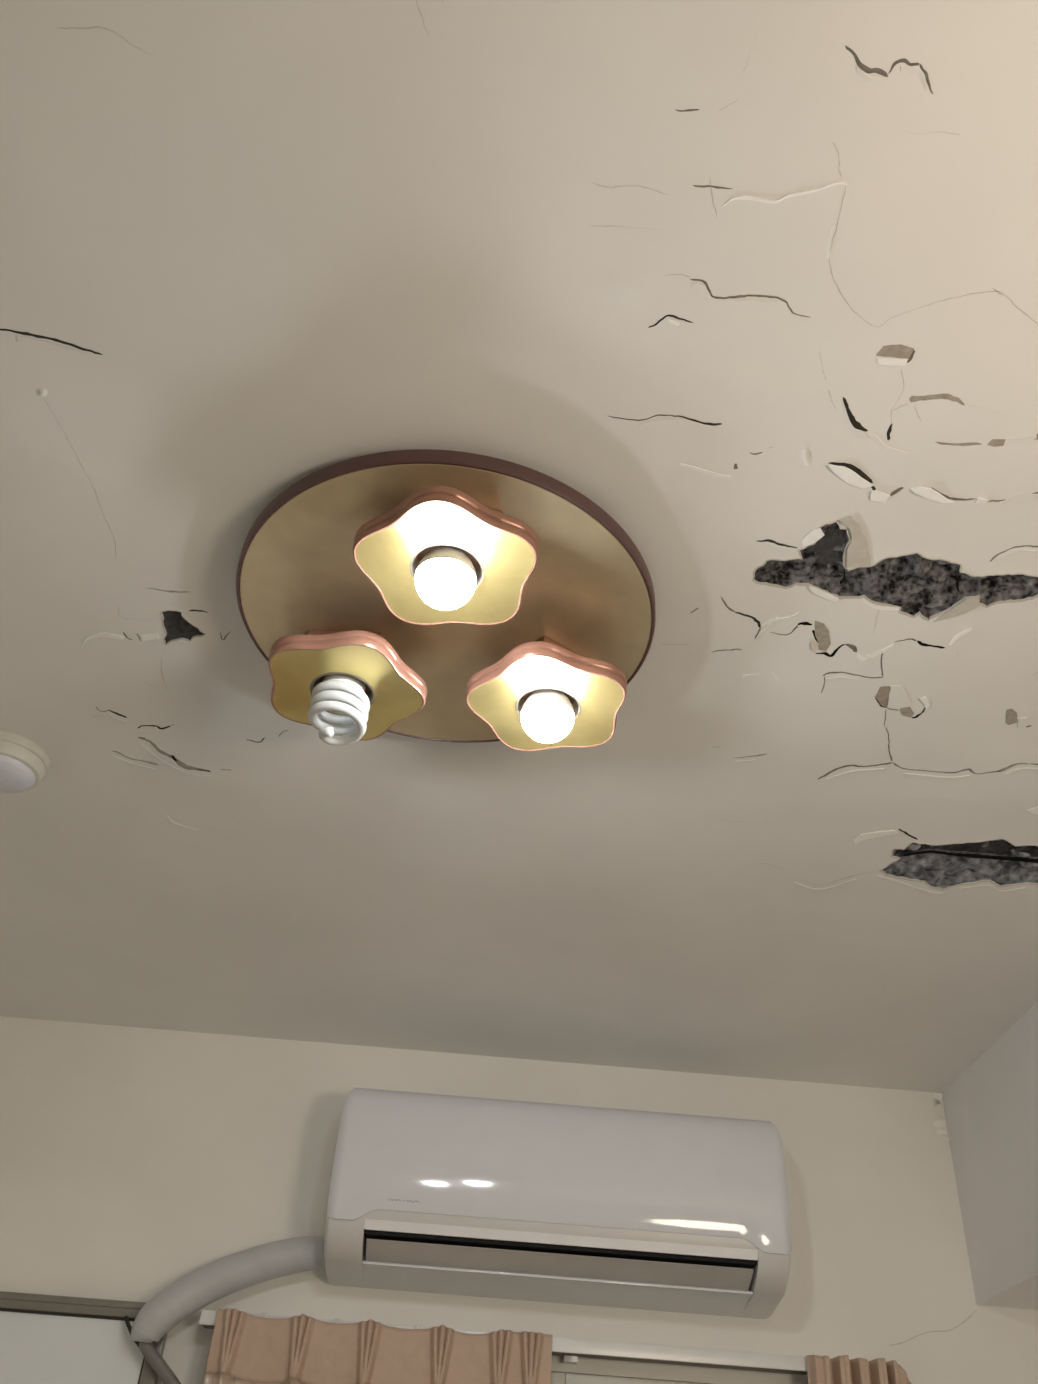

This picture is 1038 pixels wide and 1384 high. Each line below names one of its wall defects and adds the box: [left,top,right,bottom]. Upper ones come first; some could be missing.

crack [845,46,933,94]
crack [594,143,1038,328]
crack [0,329,103,364]
crack [819,353,908,456]
peeling [936,434,1038,447]
crack [757,539,797,557]
spalling [752,516,1038,622]
spalling [83,610,230,648]
crack [660,597,799,652]
crack [821,610,972,693]
crack [817,762,1038,784]
spalling [853,829,1038,897]